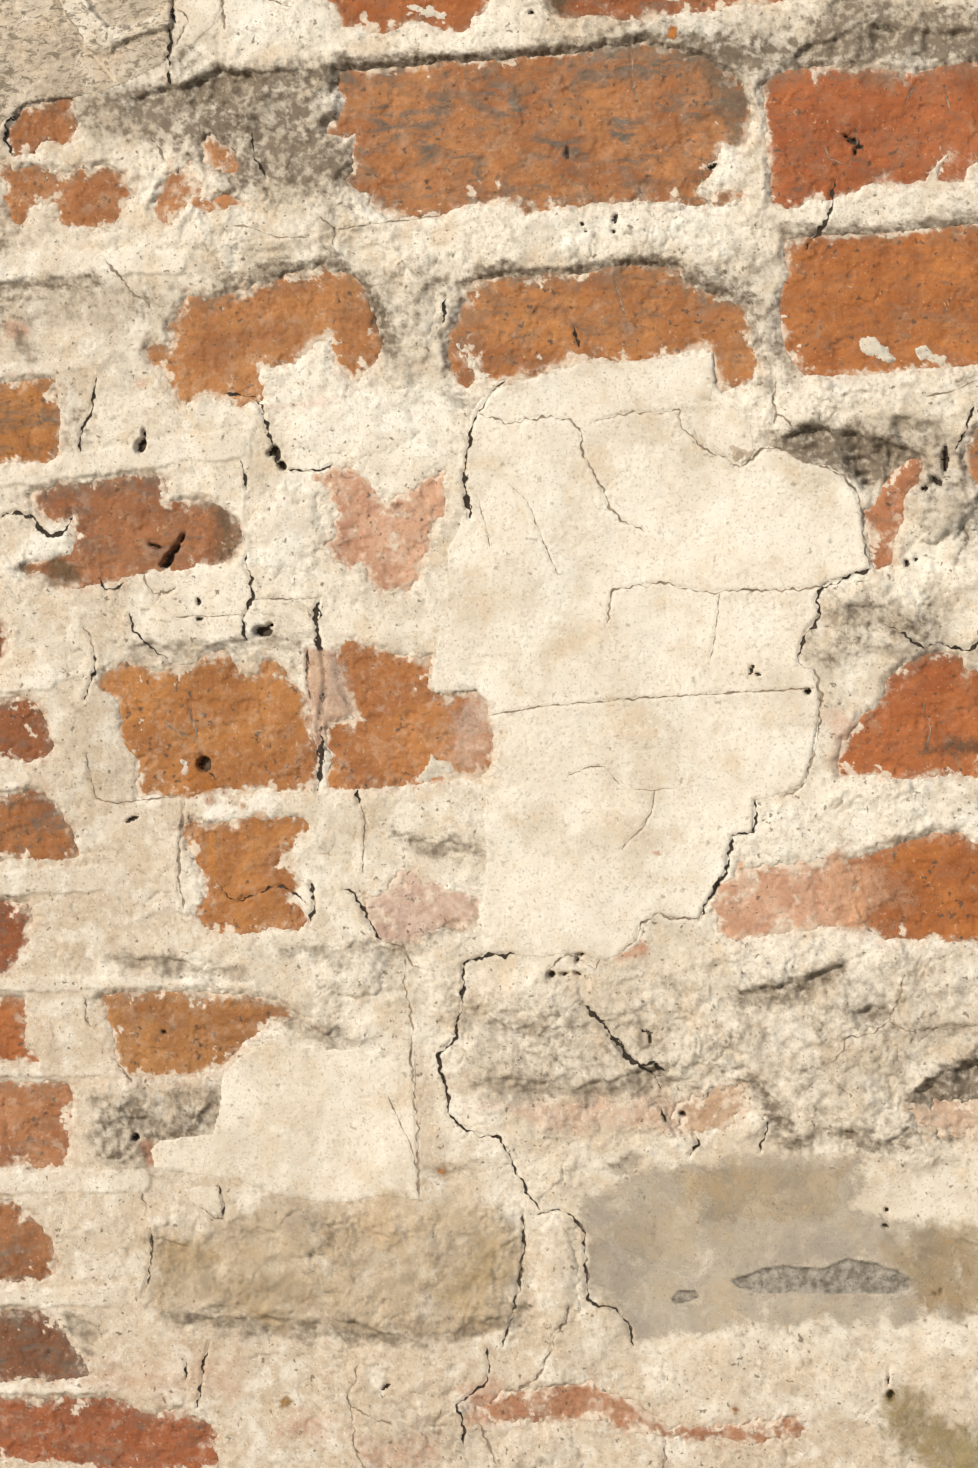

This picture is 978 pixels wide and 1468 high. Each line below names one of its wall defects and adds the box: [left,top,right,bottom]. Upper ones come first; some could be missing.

flaking render [327,41,978,233]
flaking render [145,265,384,407]
flaking render [779,224,978,377]
crack [225,392,331,487]
crack [926,380,977,450]
flaking render [23,474,242,590]
flaking render [99,641,494,798]
crack [462,377,871,969]
crack [86,554,634,1468]
crack [585,1005,666,1122]
water stain [580,1154,978,1338]
flaking render [0,1310,219,1468]